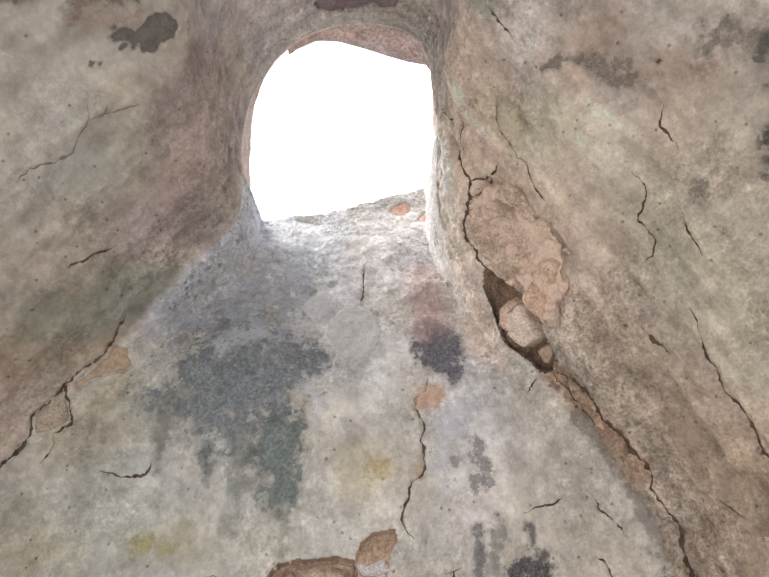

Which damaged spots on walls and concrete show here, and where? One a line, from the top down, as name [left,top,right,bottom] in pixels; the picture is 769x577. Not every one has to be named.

leakage [111,13,178,52]
spalling [314,0,398,11]
crack [0,317,125,468]
leakage [141,235,331,511]
crack [400,378,428,539]
leakage [410,283,466,386]
spalling [469,172,572,372]
crack [520,346,698,577]
crack [632,173,657,260]
crack [689,309,769,458]
spalling [267,529,397,577]
leakage [472,523,553,577]